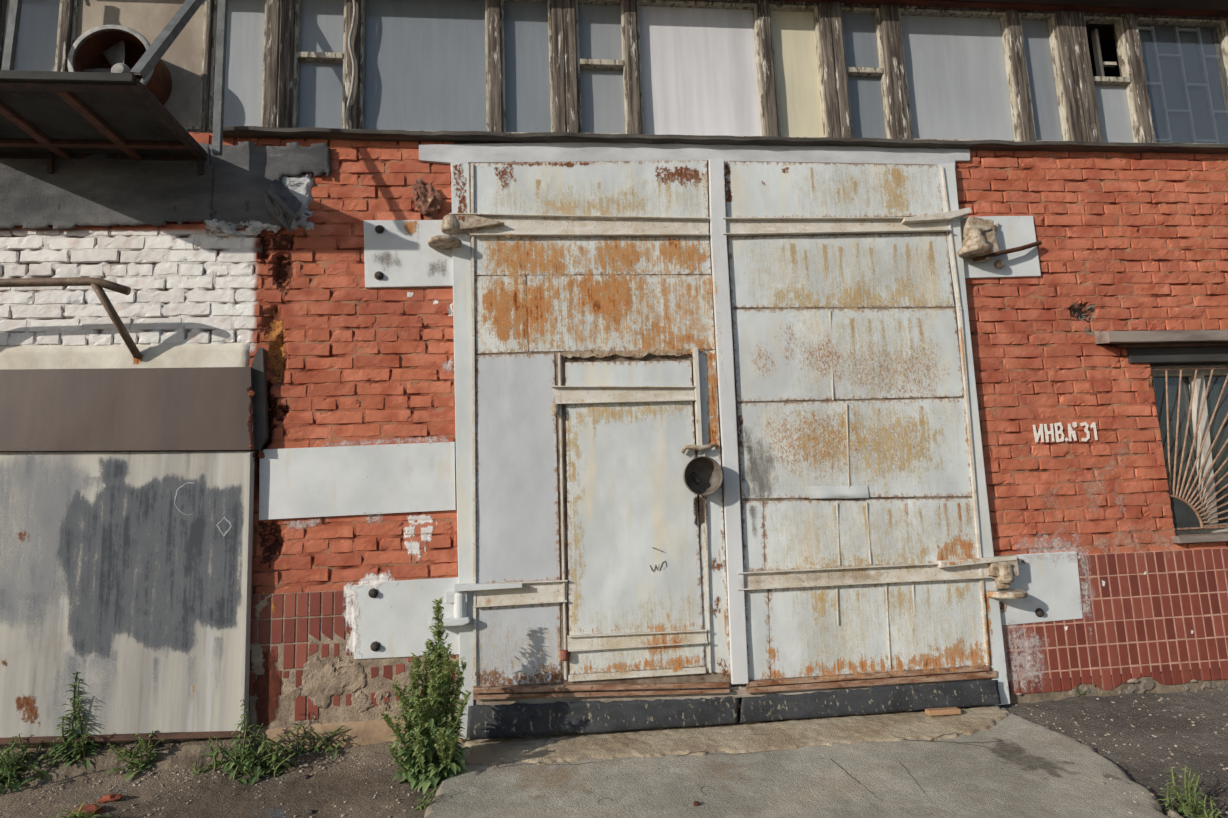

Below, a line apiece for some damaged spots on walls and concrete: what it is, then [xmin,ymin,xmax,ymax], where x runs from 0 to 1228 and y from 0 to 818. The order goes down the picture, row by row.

rust [655,165,706,193]
rust [262,303,287,384]
rust [478,180,719,450]
rust [757,243,943,478]
rust [563,400,693,616]
rust [15,696,40,724]
spalling [284,656,395,720]
rust [472,634,562,691]
rust [581,610,700,673]
rust [763,647,786,683]
rust [805,589,1007,680]